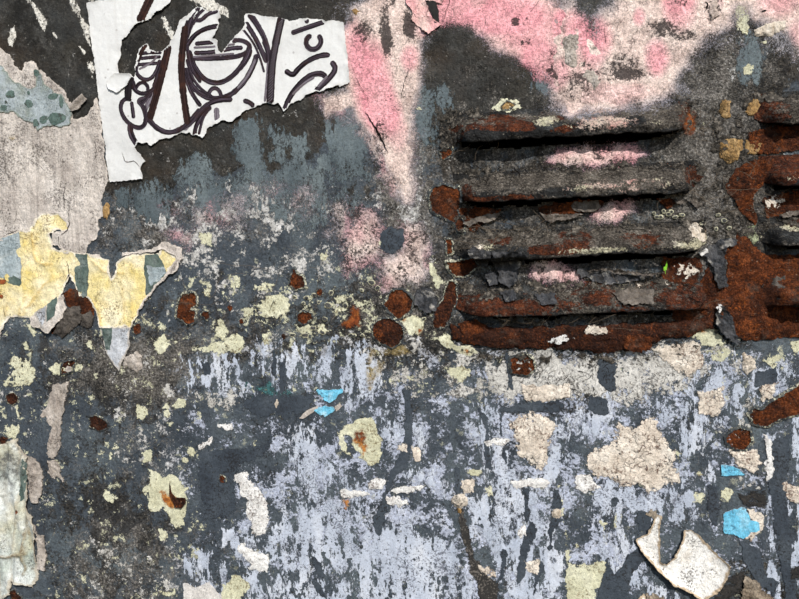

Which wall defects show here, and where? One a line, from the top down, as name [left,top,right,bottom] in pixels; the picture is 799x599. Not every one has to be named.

rust [725,124,799,225]
peeling [53,306,94,338]
rust [63,288,94,316]
rust [174,290,211,326]
rust [341,307,360,329]
rust [371,287,415,350]
rust [426,182,799,378]
peeling [162,383,175,400]
rust [354,430,366,455]
peeling [180,304,799,599]
rust [723,383,799,452]
peeling [85,416,475,599]